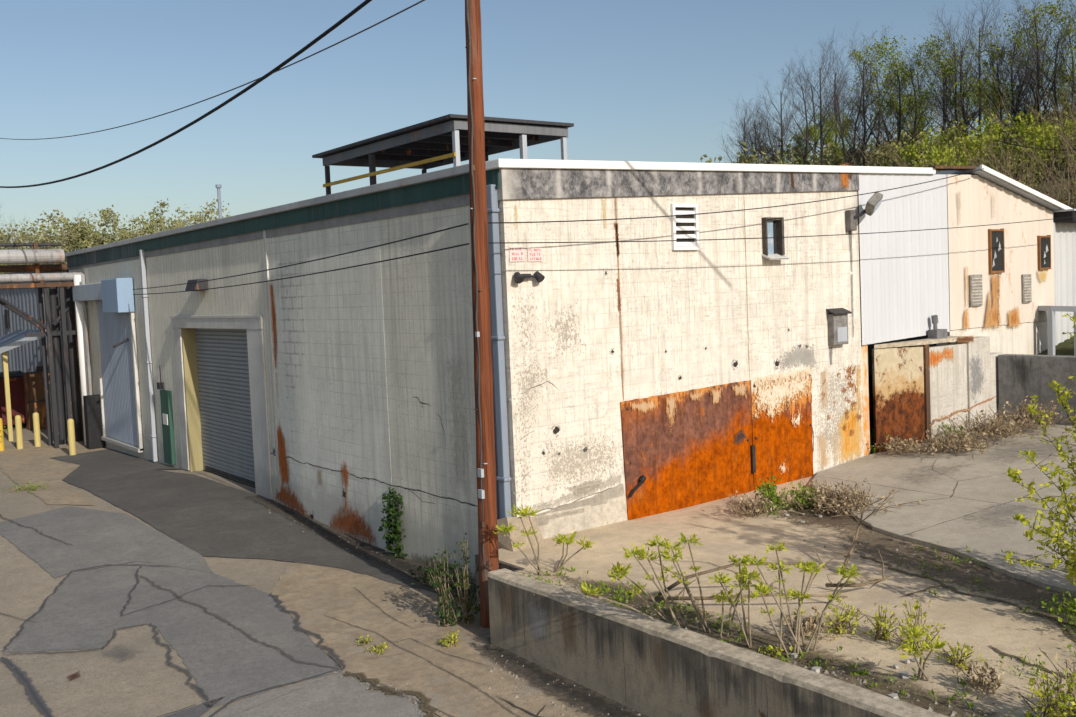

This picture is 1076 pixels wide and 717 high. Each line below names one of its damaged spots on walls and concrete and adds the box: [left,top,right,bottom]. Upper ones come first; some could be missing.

corrosion [929,266,974,367]
corrosion [985,273,1021,328]
peeling [630,358,859,468]
corrosion [276,426,304,514]
corrosion [330,465,374,544]
crack [270,453,478,507]
crack [0,657,54,717]